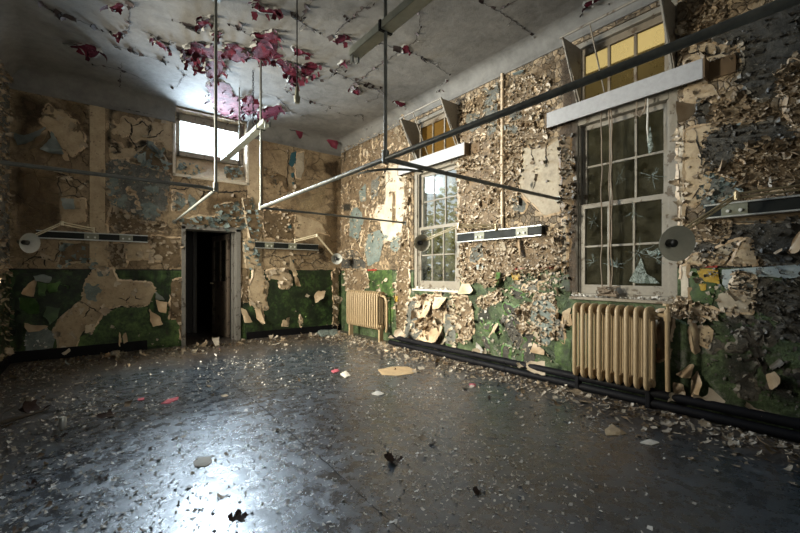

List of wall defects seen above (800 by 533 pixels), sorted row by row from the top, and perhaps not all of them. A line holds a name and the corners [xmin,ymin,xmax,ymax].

peeling [63,43,107,63]
peeling [99,3,126,15]
peeling [147,0,322,128]
crack [288,0,375,42]
peeling [331,32,352,48]
crack [262,12,451,120]
crack [479,0,534,36]
crack [113,118,163,150]
peeling [0,60,577,367]
flaking render [655,0,800,410]